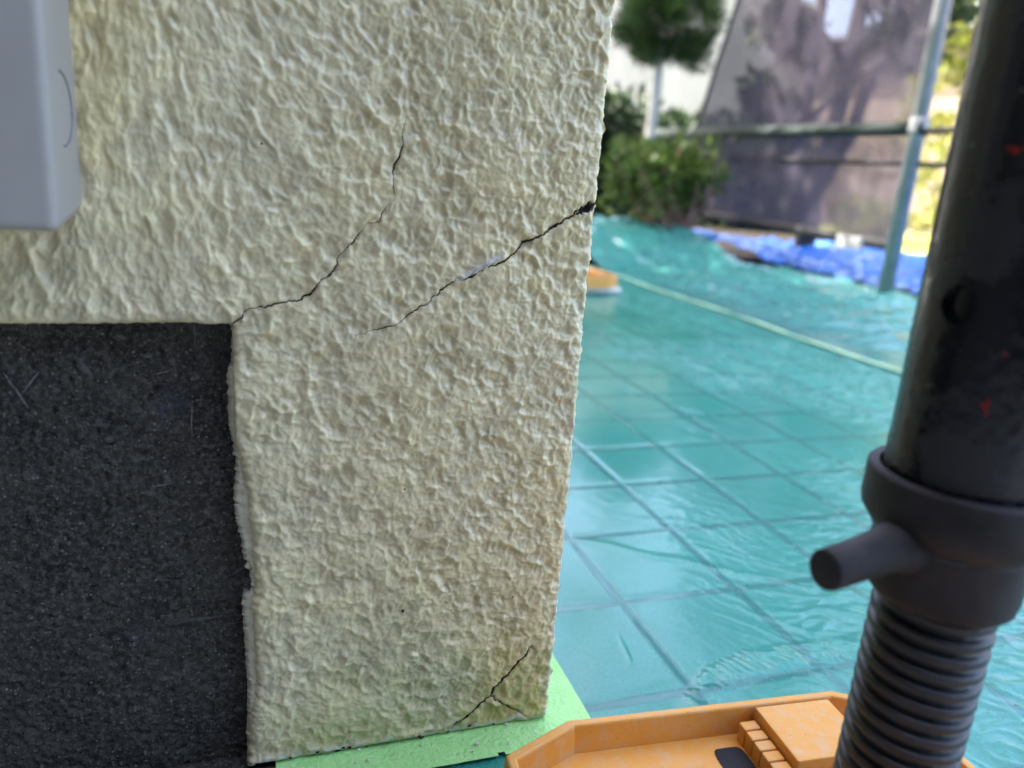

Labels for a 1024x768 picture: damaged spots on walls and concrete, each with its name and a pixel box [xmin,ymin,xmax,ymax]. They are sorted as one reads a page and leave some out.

crack [232,119,406,325]
crack [356,211,580,336]
crack [448,647,530,731]